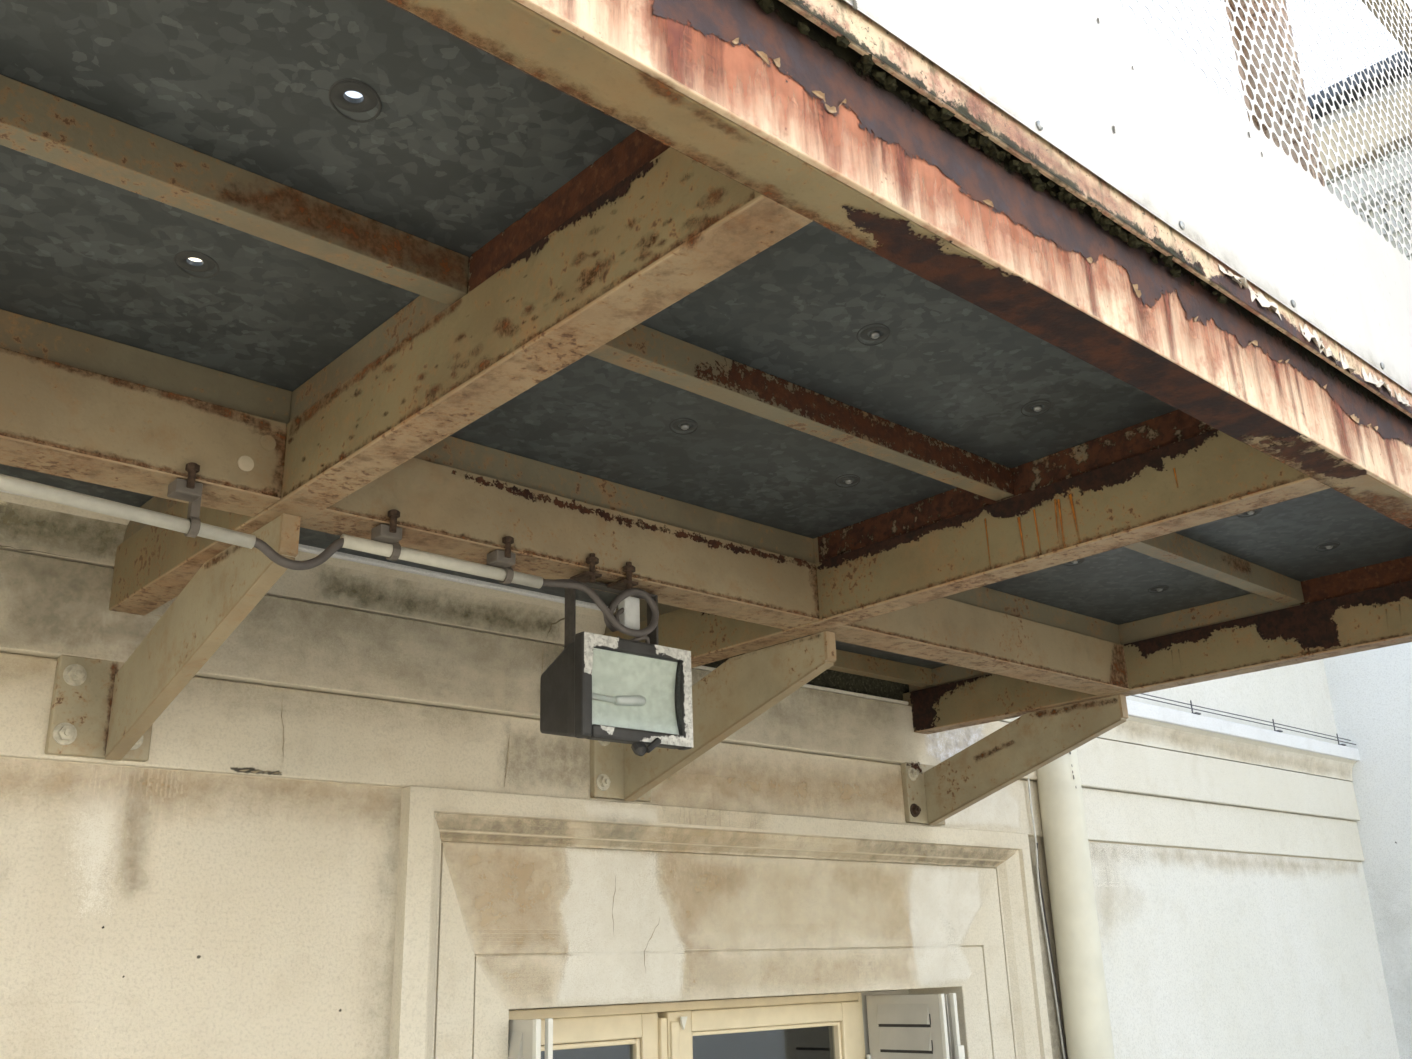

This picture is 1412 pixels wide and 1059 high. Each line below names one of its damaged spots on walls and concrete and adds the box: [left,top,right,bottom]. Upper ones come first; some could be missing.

rust [0,0,1412,732]
peeling [1153,238,1412,414]
leakage [468,845,690,1007]
leakage [907,863,983,986]